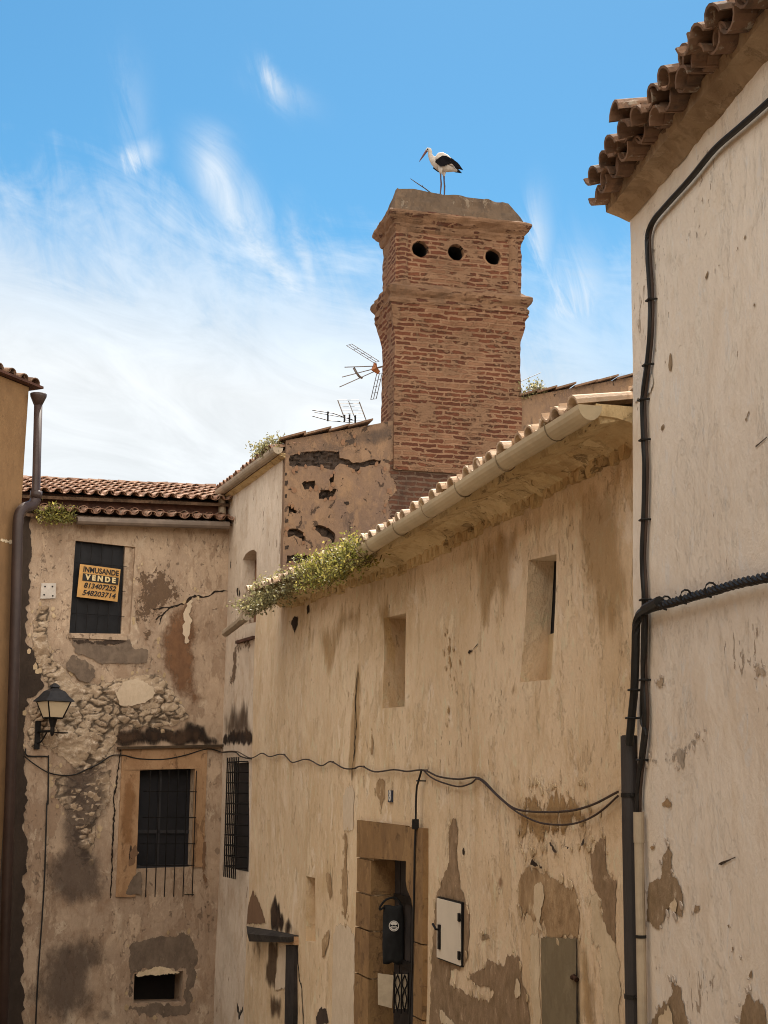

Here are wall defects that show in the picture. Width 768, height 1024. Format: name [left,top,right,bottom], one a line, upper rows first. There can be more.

flaking render [285,434,456,565]
crack [153,562,231,624]
water stain [52,767,103,901]
spalling [0,516,199,1024]
water stain [116,707,252,746]
peeling [247,891,266,927]
peeling [429,819,530,1024]
peeling [516,777,617,946]
peeling [645,838,700,929]
peeling [734,971,766,1024]